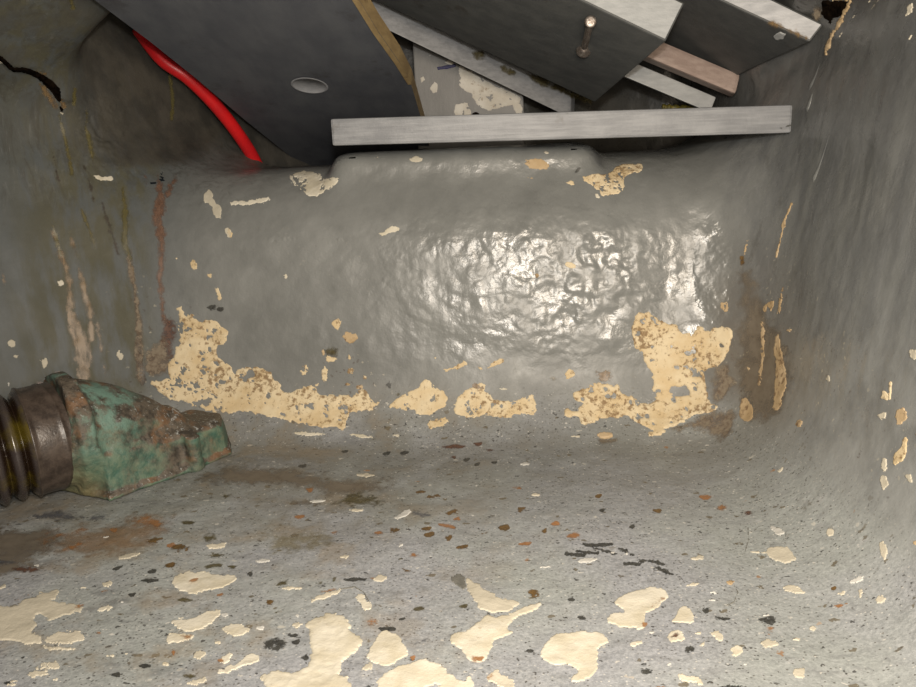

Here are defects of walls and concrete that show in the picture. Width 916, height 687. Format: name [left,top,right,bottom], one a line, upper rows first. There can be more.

crack [0,56,63,112]
peeling [567,163,643,198]
rust [153,179,175,323]
peeling [151,288,379,438]
peeling [389,379,537,429]
peeling [564,312,733,436]
leakage [678,411,735,437]
leakage [714,273,788,421]
peeling [0,589,84,678]
peeling [260,613,474,687]
peeling [540,630,609,683]
peeling [607,586,668,630]